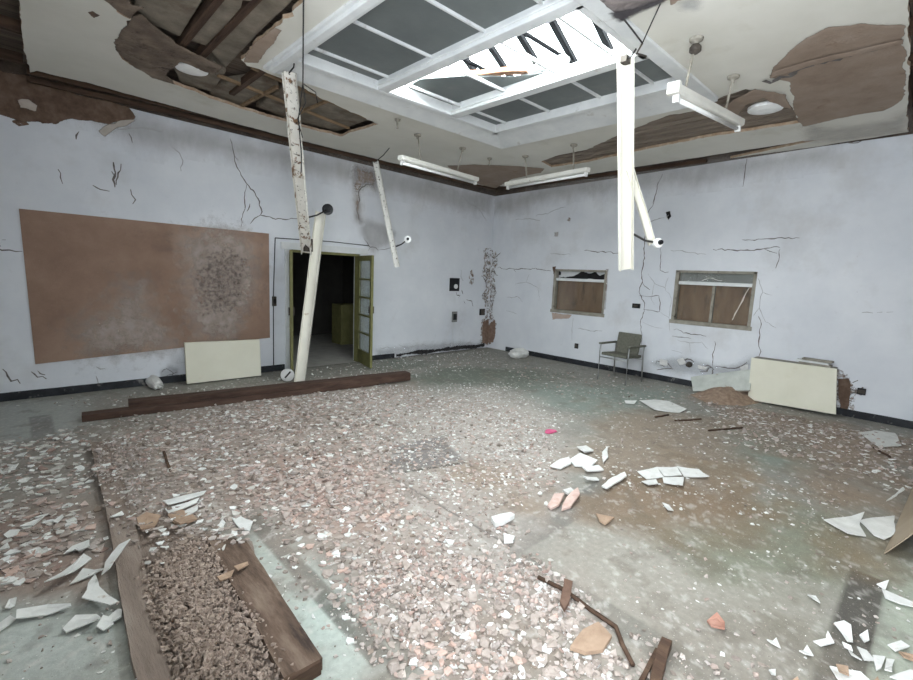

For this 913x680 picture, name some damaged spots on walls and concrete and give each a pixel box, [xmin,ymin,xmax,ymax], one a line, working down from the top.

flaking render [105,0,222,85]
flaking render [244,28,282,63]
flaking render [600,0,680,22]
flaking render [723,23,907,126]
crack [93,162,136,204]
crack [230,139,297,226]
spalling [456,248,500,345]
crack [639,174,797,366]